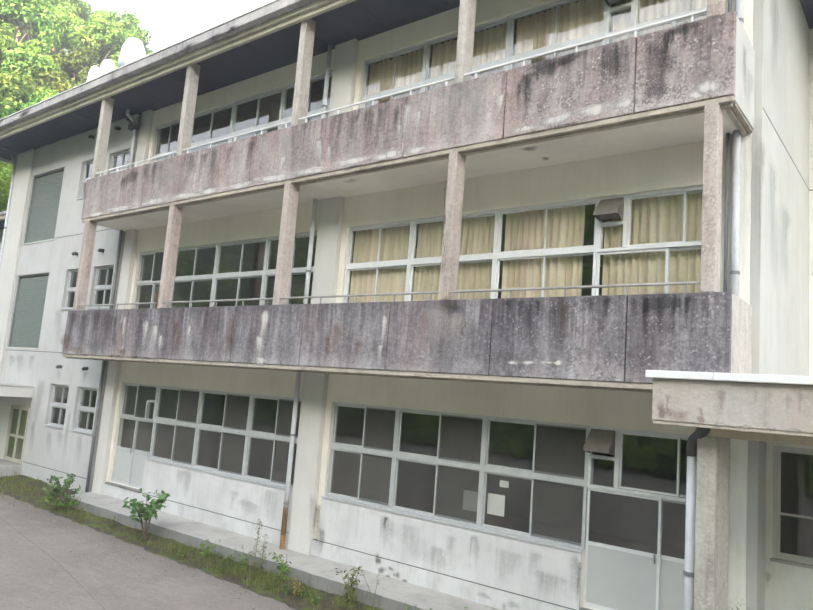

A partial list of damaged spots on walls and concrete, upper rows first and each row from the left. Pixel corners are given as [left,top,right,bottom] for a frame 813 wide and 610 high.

leakage [689,80,721,99]
leakage [580,98,631,116]
leakage [512,112,570,133]
leakage [230,132,425,190]
leakage [142,188,216,205]
leakage [144,321,162,347]
leakage [256,311,268,365]
leakage [378,315,387,357]